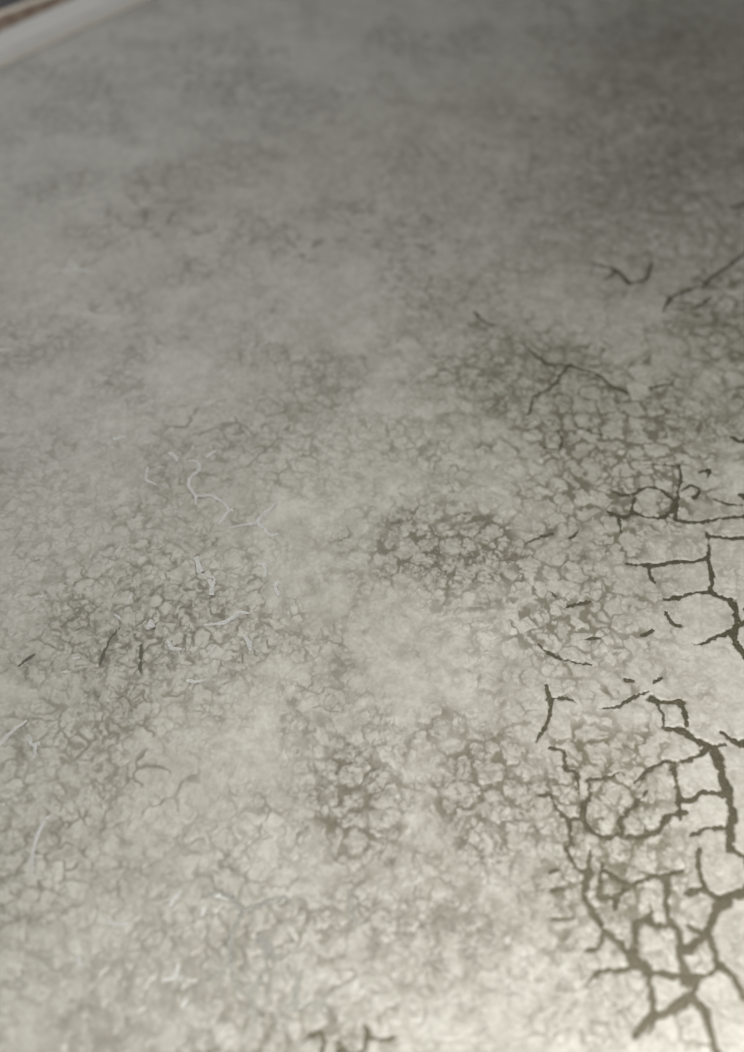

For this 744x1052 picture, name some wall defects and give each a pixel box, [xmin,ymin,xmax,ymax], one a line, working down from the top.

crack [543,427,611,451]
crack [145,450,278,537]
crack [61,595,132,674]
crack [138,619,182,674]
crack [193,556,216,595]
crack [186,610,252,684]
crack [526,530,579,544]
crack [537,637,601,666]
crack [551,592,592,609]
crack [606,463,744,660]
crack [535,676,744,1052]
crack [162,889,397,1052]